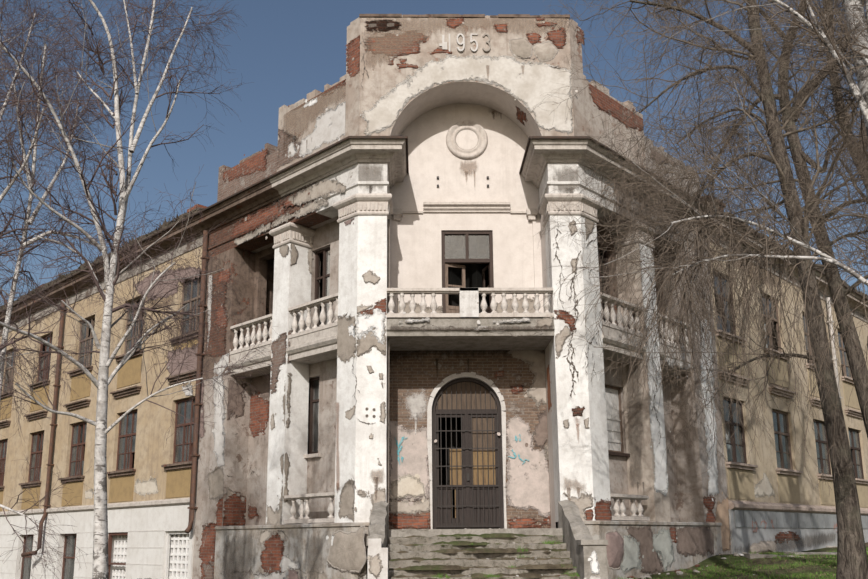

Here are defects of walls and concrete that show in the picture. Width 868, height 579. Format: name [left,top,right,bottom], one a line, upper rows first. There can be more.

spalling [526,18,585,49]
spalling [288,19,452,111]
spalling [589,84,646,133]
spalling [223,127,304,182]
crack [553,224,599,396]
spalling [225,328,293,438]
spalling [345,402,387,424]
spalling [198,452,299,579]
spalling [338,478,386,522]
spalling [389,496,431,529]
spalling [508,516,551,529]
spalling [627,526,664,574]